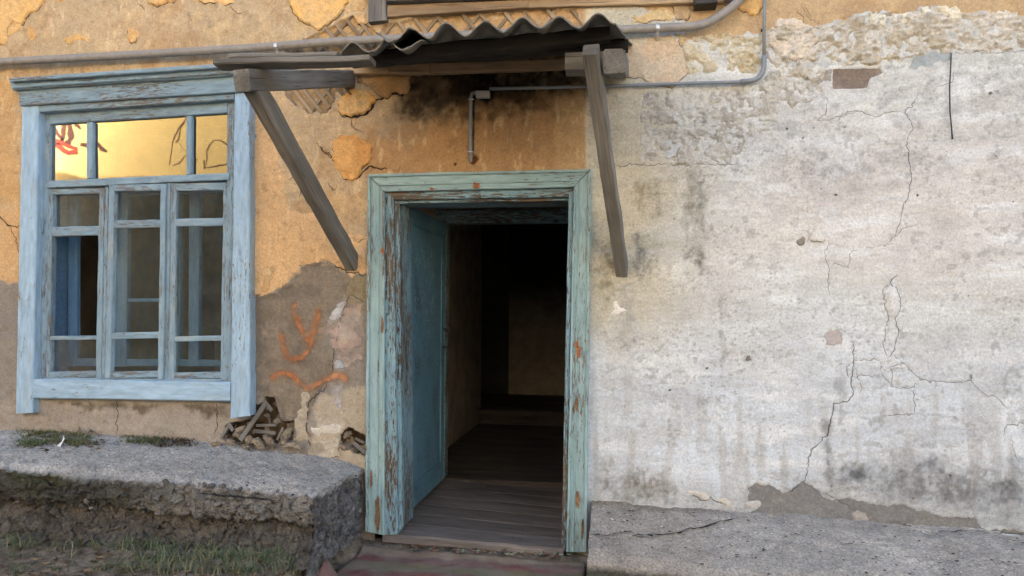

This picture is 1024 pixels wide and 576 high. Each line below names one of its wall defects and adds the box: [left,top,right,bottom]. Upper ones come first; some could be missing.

peeling [0,0,44,46]
peeling [288,0,368,31]
peeling [723,0,763,17]
peeling [338,75,411,118]
damp [399,62,584,151]
flaking render [626,5,1024,168]
peeling [331,135,372,182]
crack [817,50,1024,293]
peeling [210,262,366,458]
crack [790,276,1023,512]
crack [591,509,735,536]
flaking render [744,480,1024,534]